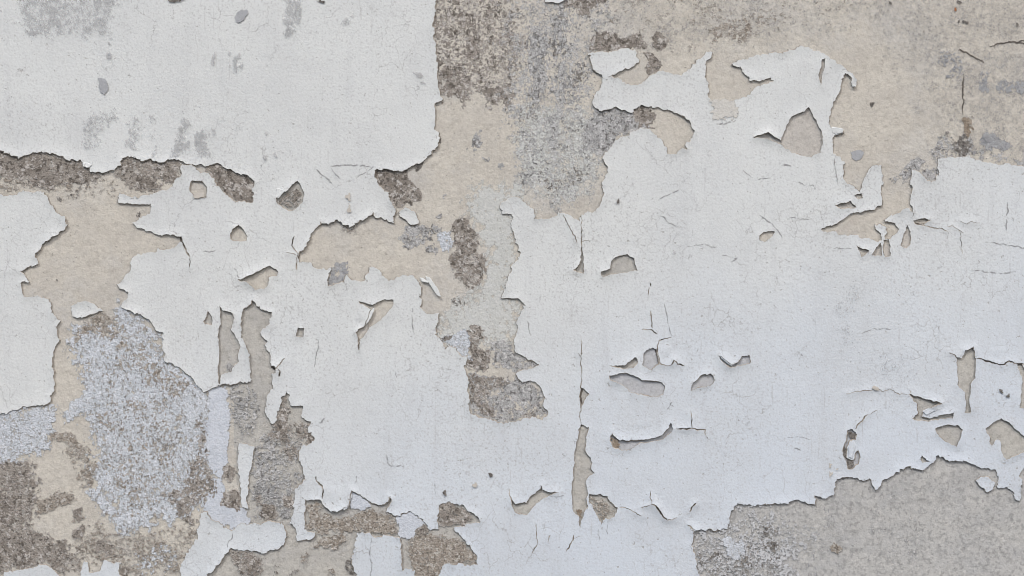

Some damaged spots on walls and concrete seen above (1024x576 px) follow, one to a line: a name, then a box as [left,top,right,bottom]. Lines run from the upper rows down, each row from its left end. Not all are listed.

peeling [299,0,1024,423]
peeling [0,151,480,576]
peeling [572,425,617,524]
peeling [692,429,1024,576]
peeling [911,348,975,446]
peeling [986,419,1024,460]